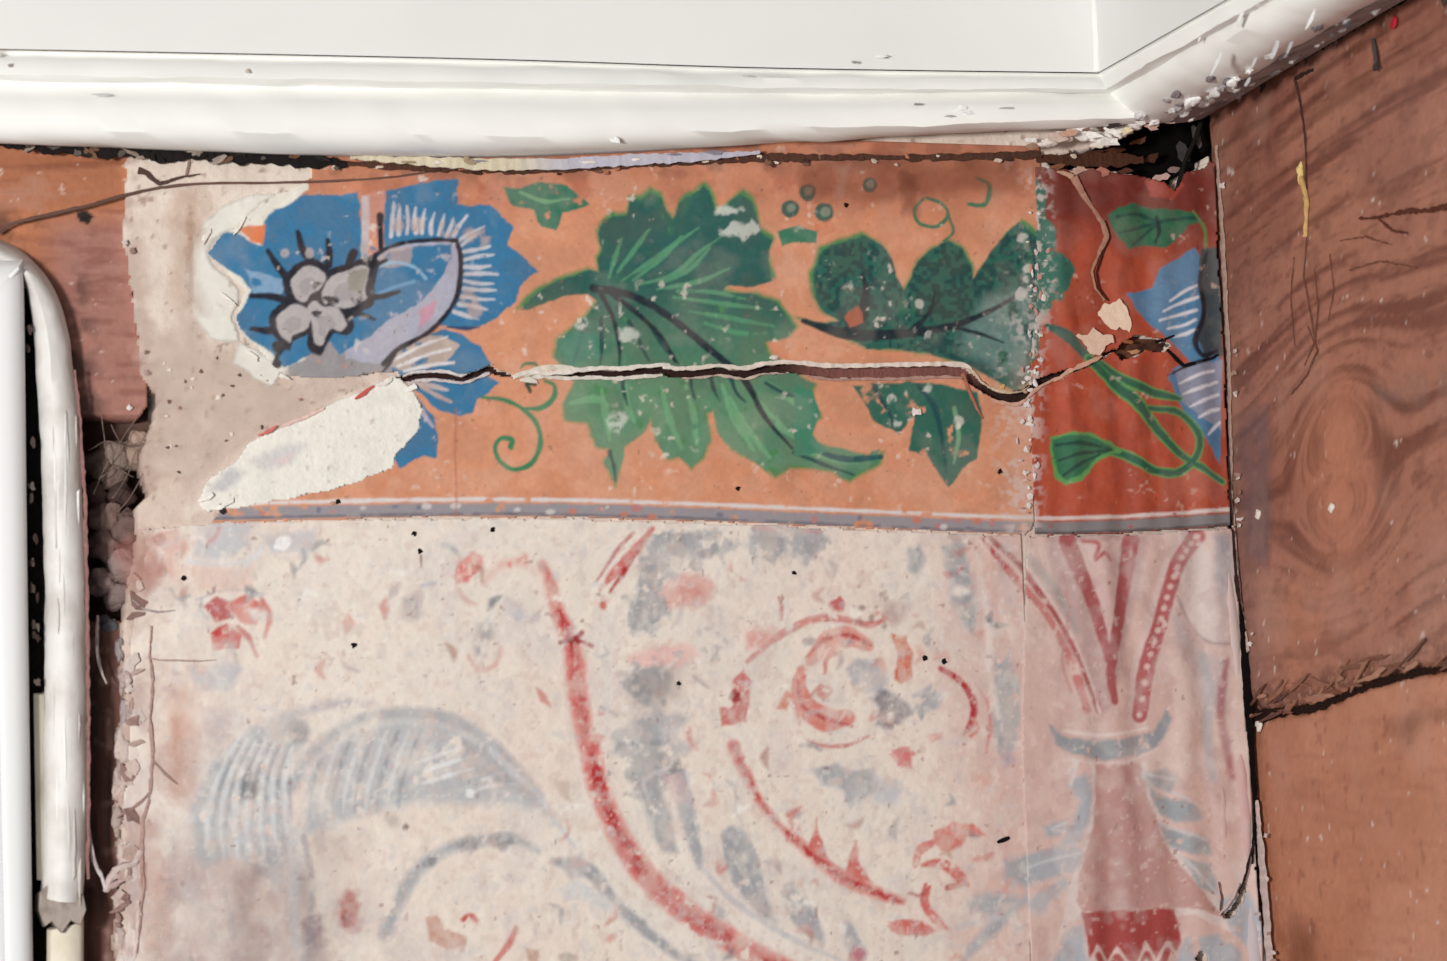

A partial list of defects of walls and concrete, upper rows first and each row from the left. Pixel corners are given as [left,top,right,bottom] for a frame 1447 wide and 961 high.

spalling [1025,9,1351,182]
peeling [185,193,291,385]
peeling [197,377,423,515]
crack [399,350,1116,419]
crack [1155,335,1218,367]
flaking render [109,572,149,961]